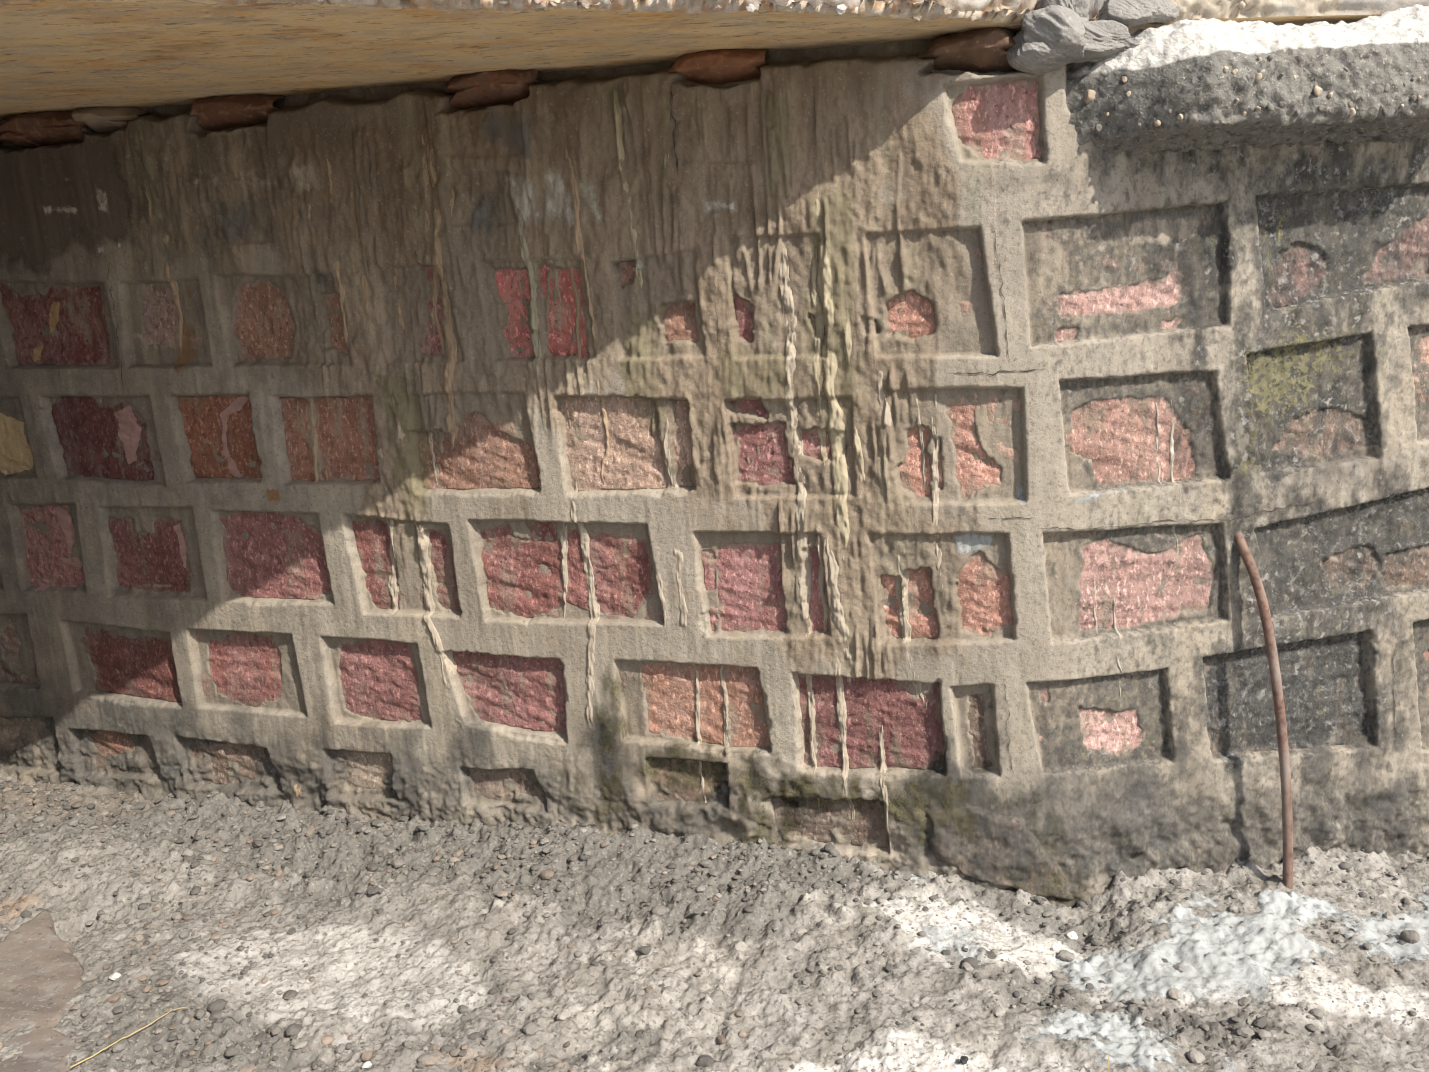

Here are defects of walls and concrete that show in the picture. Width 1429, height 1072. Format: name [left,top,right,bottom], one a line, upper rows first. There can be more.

water stain [0,129,169,272]
water stain [421,135,458,485]
water stain [512,148,609,484]
spalling [114,405,142,464]
spalling [219,396,249,478]
spalling [173,522,187,568]
water stain [386,519,399,614]
water stain [656,548,688,637]
water stain [779,236,865,820]
water stain [877,138,1429,893]
water stain [4,680,190,794]
water stain [218,737,346,815]